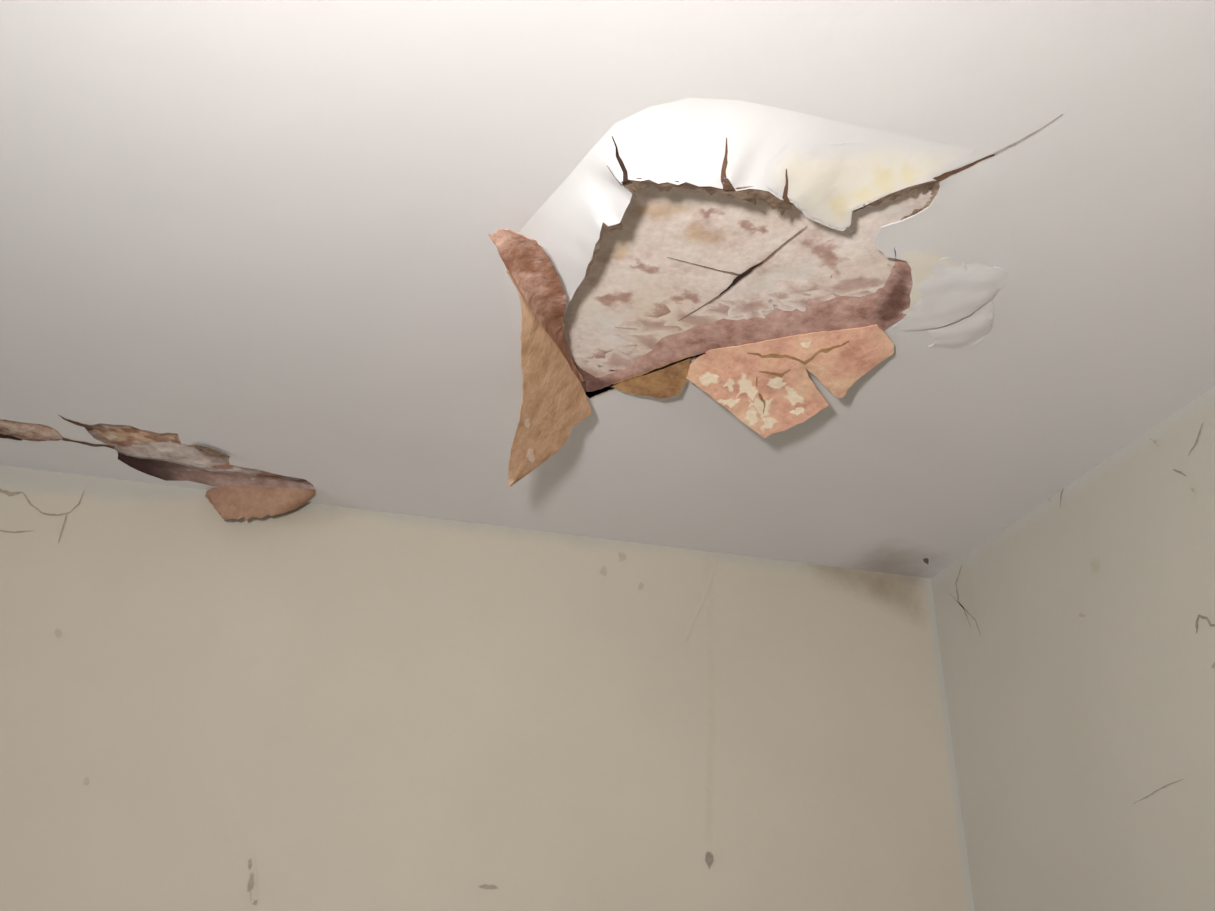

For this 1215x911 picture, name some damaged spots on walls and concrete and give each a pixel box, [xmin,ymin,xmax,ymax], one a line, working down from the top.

flaking render [488,136,1009,487]
crack [0,488,85,543]
peeling [0,415,315,520]